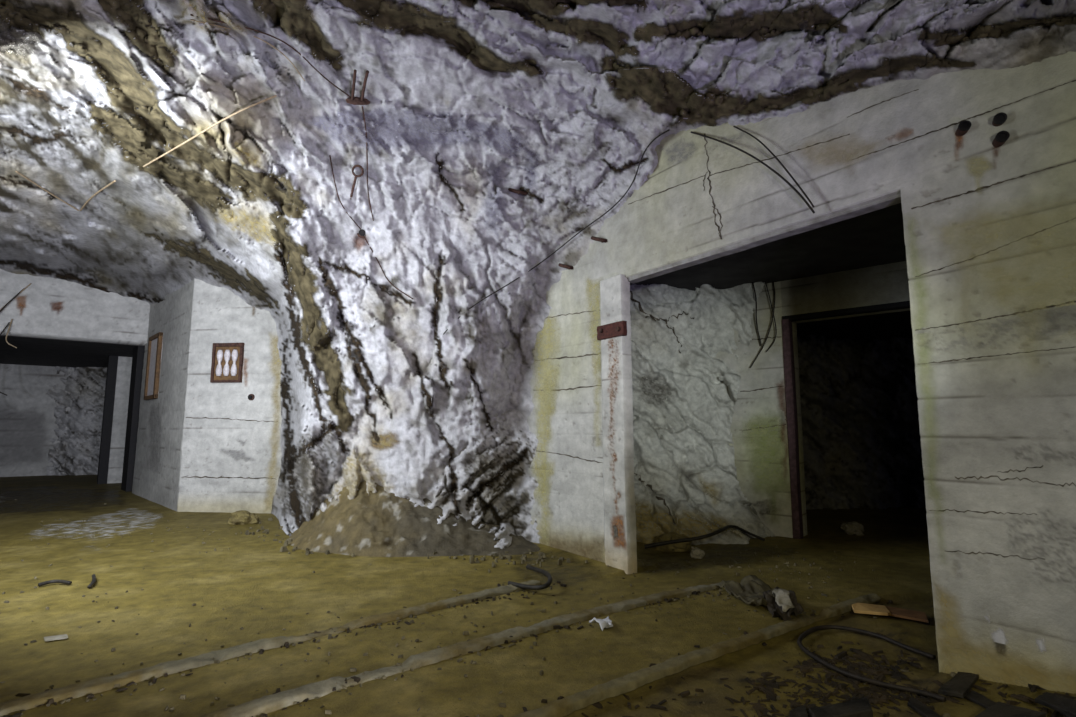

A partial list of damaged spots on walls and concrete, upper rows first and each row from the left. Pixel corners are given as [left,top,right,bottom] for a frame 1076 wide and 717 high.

crack [629,80,1076,239]
crack [955,465,1076,487]
corrosion [612,493,626,547]
crack [929,508,1037,516]
crack [946,550,1045,560]